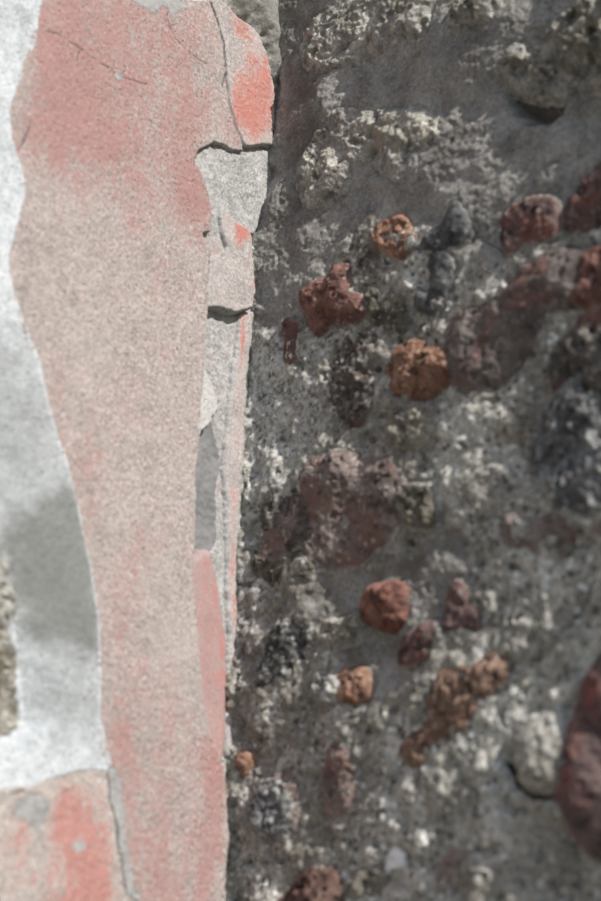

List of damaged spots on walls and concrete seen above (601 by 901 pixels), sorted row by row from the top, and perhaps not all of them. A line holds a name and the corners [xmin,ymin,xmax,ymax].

crack [167,2,247,147]
spalling [195,144,272,257]
spalling [193,309,254,762]
crack [108,765,141,899]